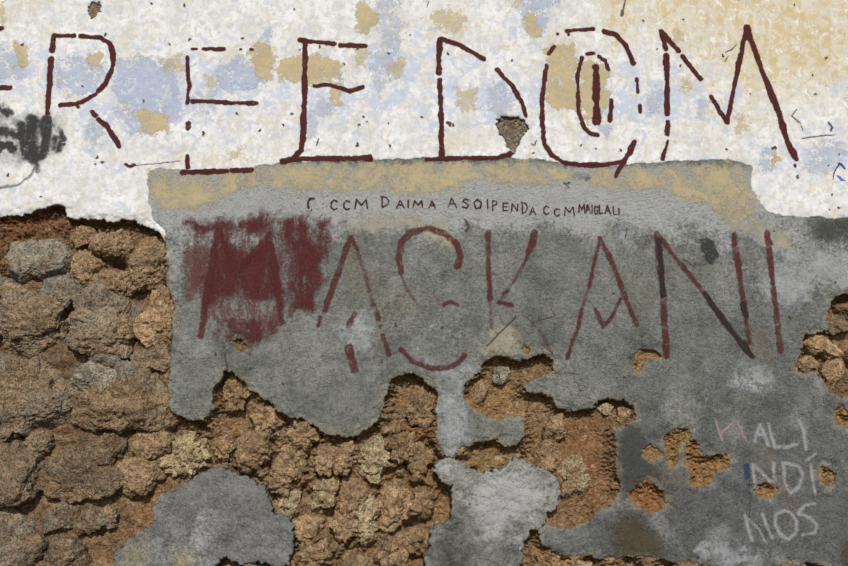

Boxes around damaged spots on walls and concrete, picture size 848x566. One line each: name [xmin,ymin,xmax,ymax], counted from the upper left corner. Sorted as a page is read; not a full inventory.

peeling [149,83,757,221]
spalling [833,404,848,428]
spalling [642,428,730,488]
spalling [628,479,666,513]